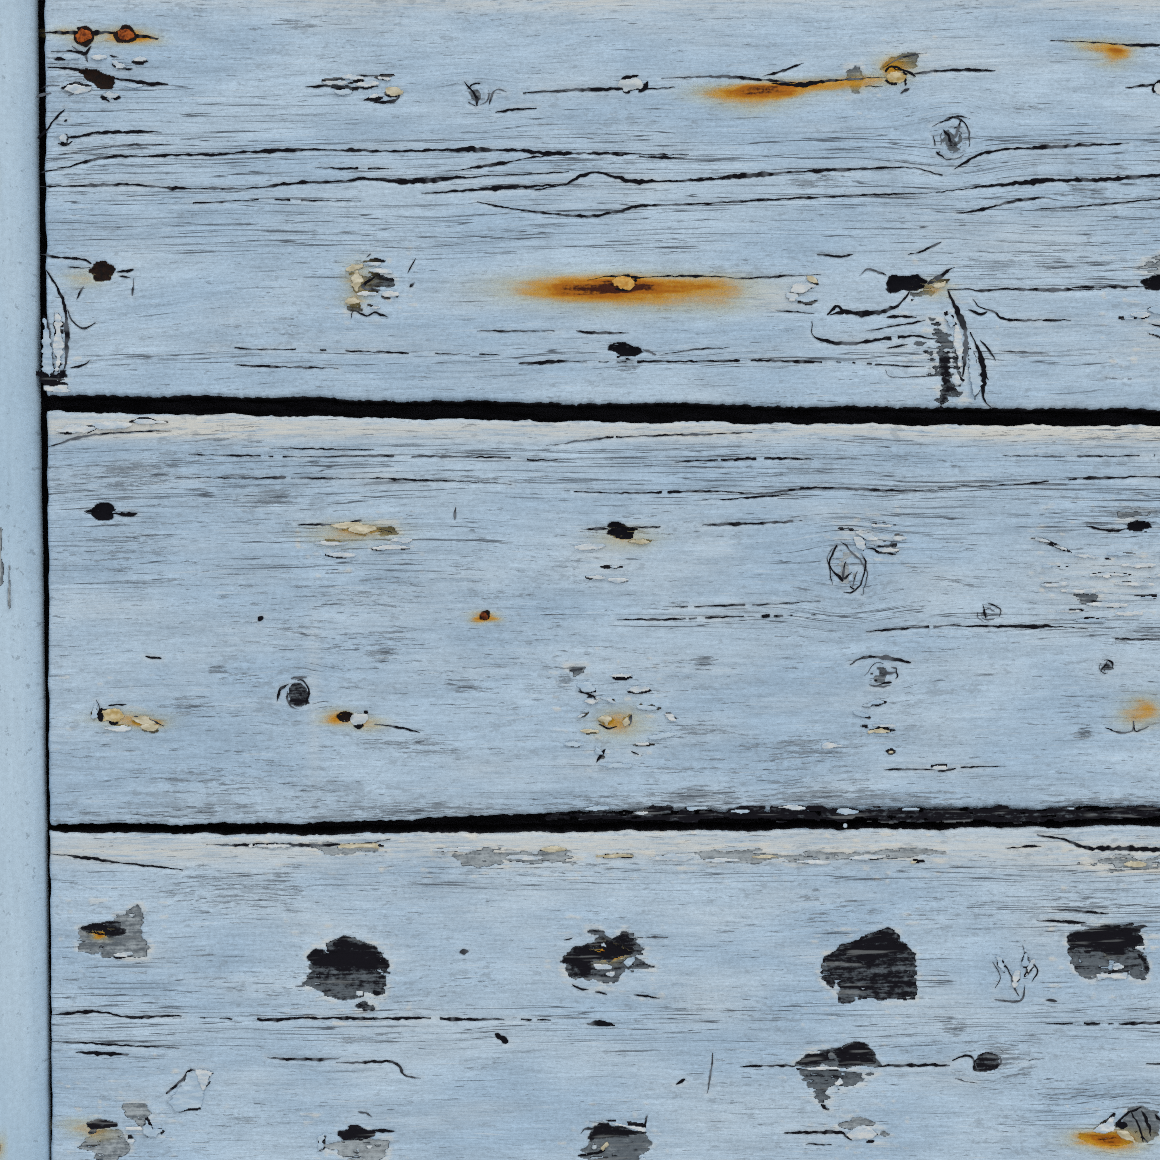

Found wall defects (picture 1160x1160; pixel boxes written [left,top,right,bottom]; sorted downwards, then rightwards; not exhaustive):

rust [107,31,153,43]
rust [705,61,905,103]
rust [518,275,737,305]
peeling [77,905,151,959]
peeling [296,936,390,1011]
peeling [560,930,668,995]
peeling [820,927,918,1004]
peeling [1046,909,1150,980]
peeling [795,1042,882,1110]
peeling [578,1115,652,1160]
peeling [784,1117,890,1146]
rust [1077,1131,1133,1149]